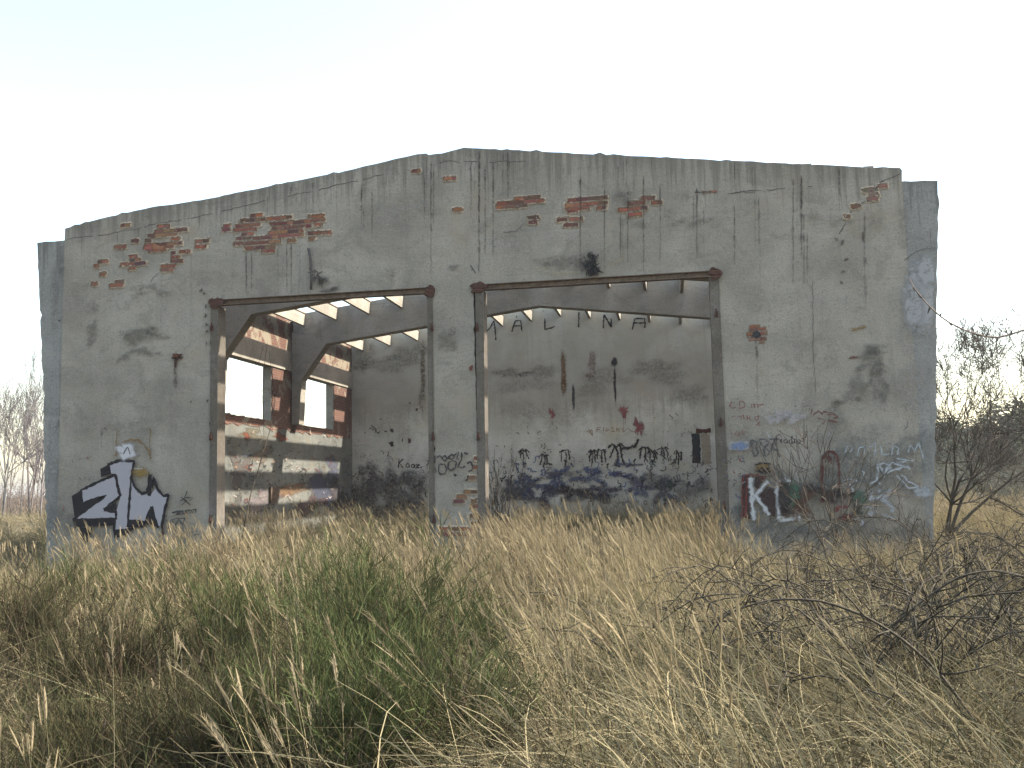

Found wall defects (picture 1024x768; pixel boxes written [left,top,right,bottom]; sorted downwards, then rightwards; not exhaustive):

spalling [493,193,546,226]
spalling [554,194,664,229]
spalling [841,182,890,221]
crack [839,174,900,234]
spalling [90,211,333,290]
spalling [746,324,768,344]
spalling [435,454,480,539]